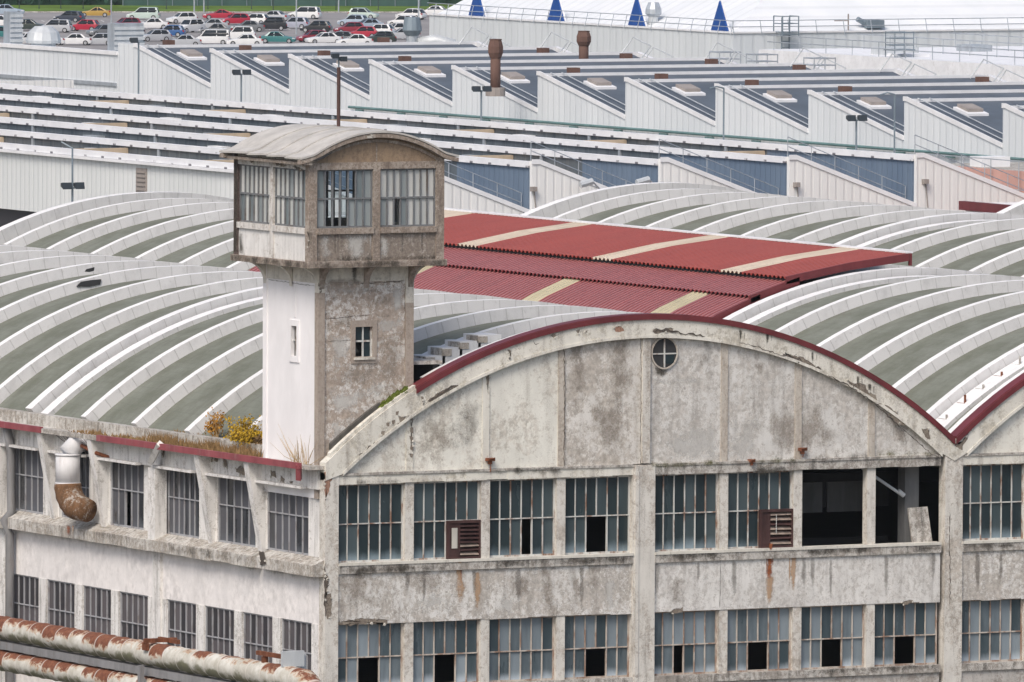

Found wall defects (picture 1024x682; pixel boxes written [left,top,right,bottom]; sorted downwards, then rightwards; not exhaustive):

crack [640,329,705,379]
spalling [380,411,414,458]
crack [323,564,331,617]
corrosion [456,562,480,603]